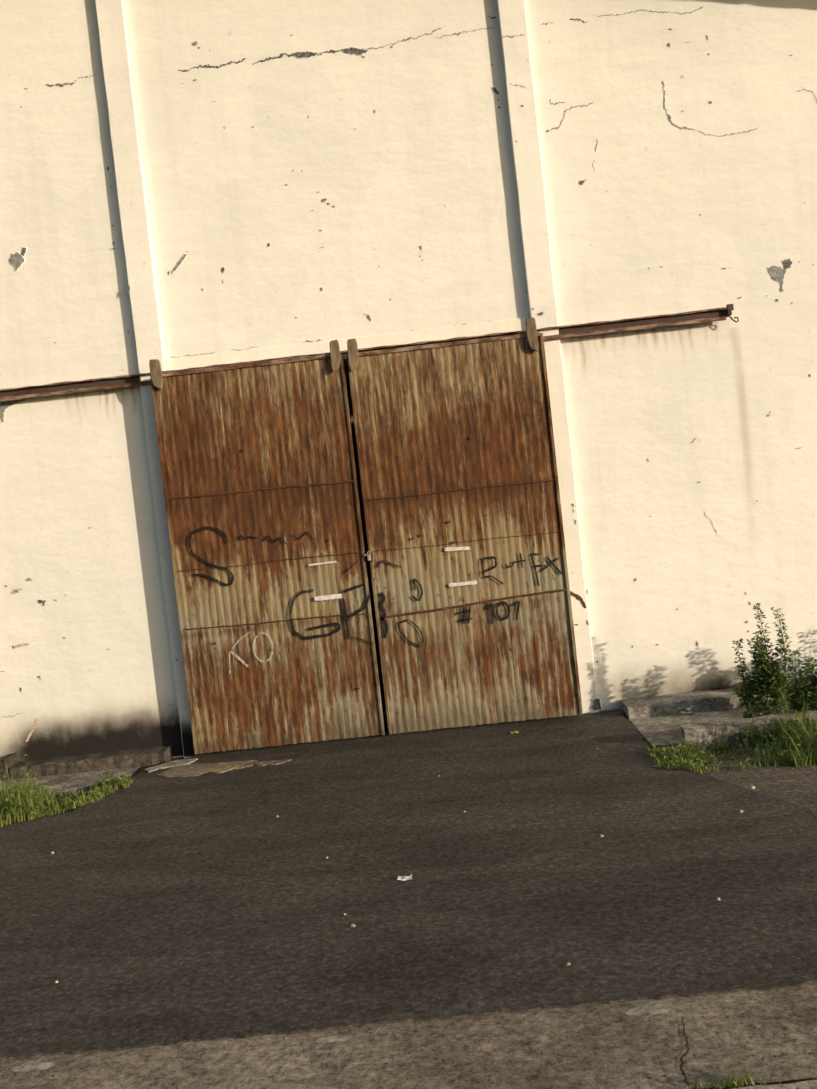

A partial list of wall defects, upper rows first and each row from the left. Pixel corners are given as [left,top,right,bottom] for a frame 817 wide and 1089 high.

crack [178,6,704,132]
crack [20,75,94,108]
crack [662,81,758,137]
peeling [8,246,27,273]
peeling [766,259,814,302]